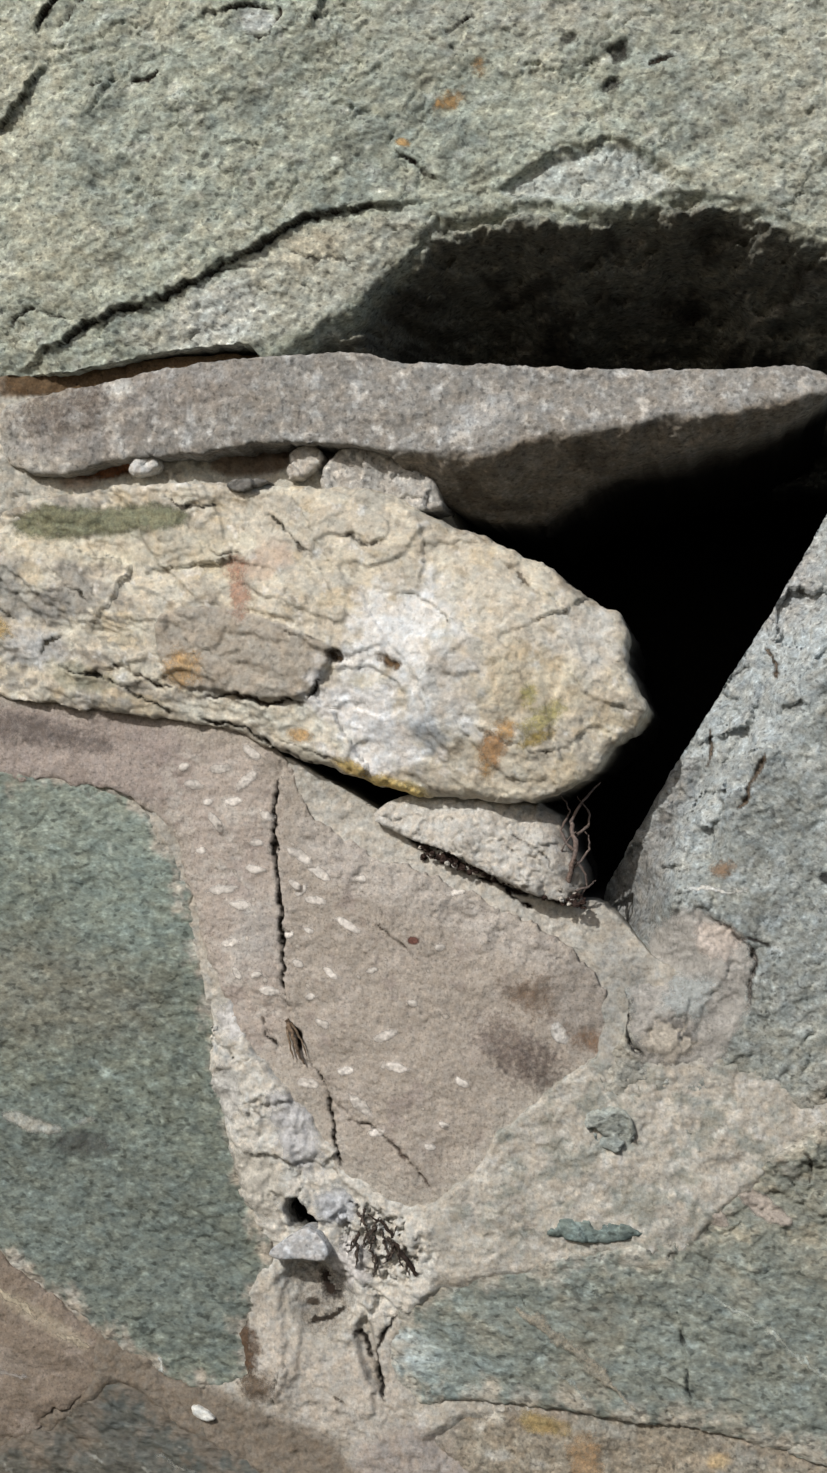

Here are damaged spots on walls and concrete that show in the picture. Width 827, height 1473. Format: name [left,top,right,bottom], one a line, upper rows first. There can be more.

crack [41,637,171,713]
crack [205,679,339,988]
crack [263,1018,429,1186]